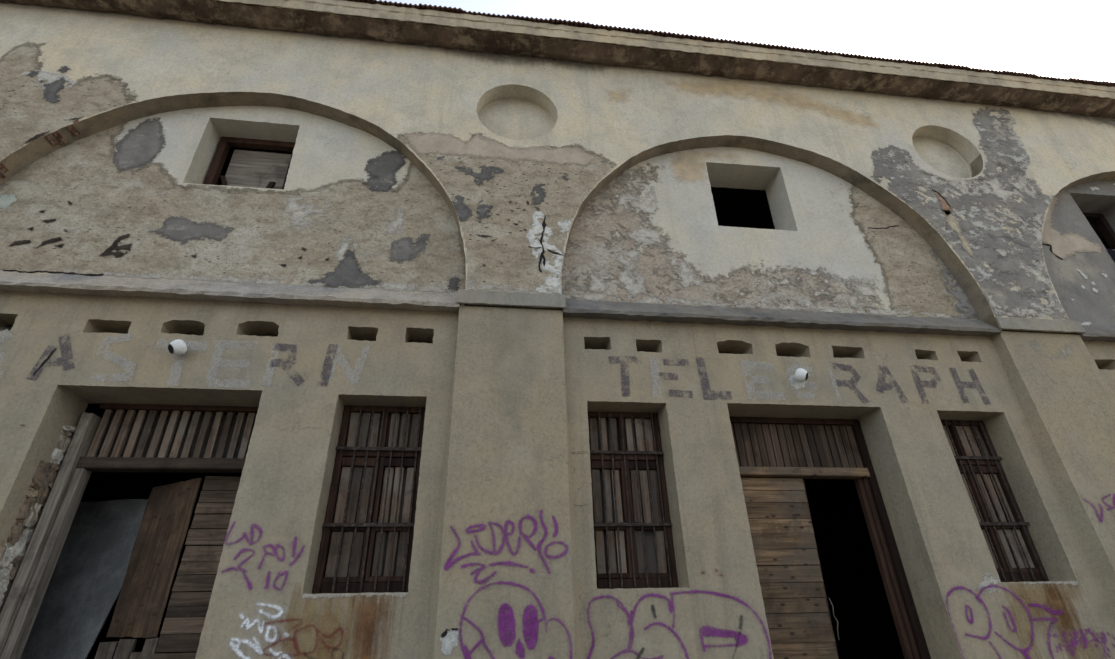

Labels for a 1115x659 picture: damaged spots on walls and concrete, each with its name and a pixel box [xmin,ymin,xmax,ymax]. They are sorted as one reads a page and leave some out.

spalling [0,41,979,320]
crack [528,215,562,273]
flaking render [871,106,1107,325]
spalling [0,425,76,608]
rust [353,597,389,659]